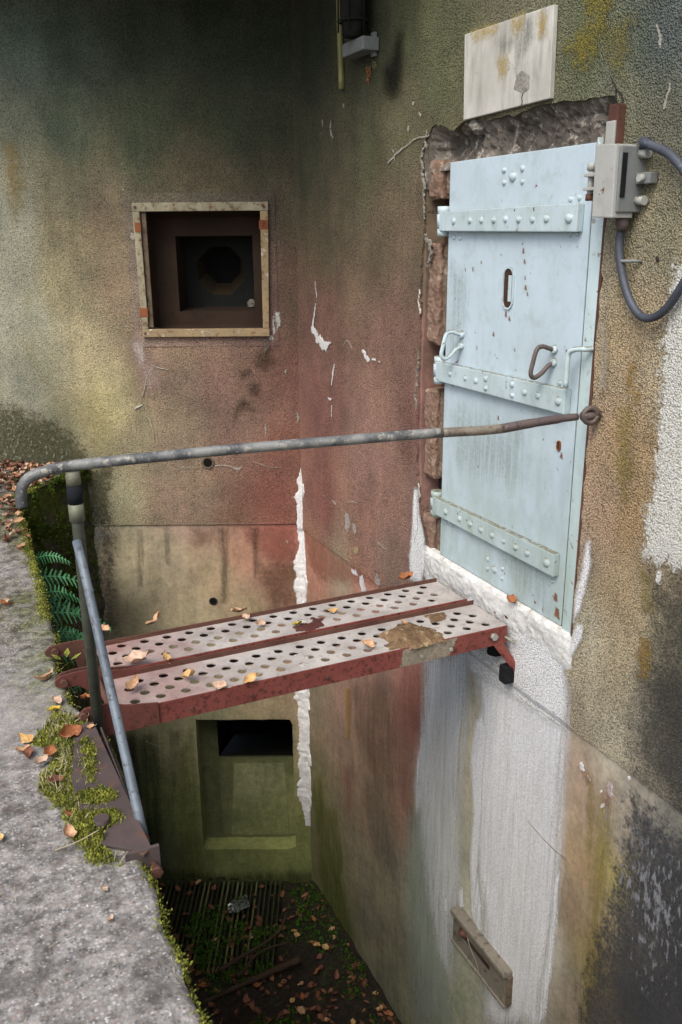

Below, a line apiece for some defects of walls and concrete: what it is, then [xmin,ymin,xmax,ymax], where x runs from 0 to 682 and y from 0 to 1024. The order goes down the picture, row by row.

crack [387,131,429,164]
spalling [420,70,618,219]
spalling [424,234,433,267]
damp [244,312,281,391]